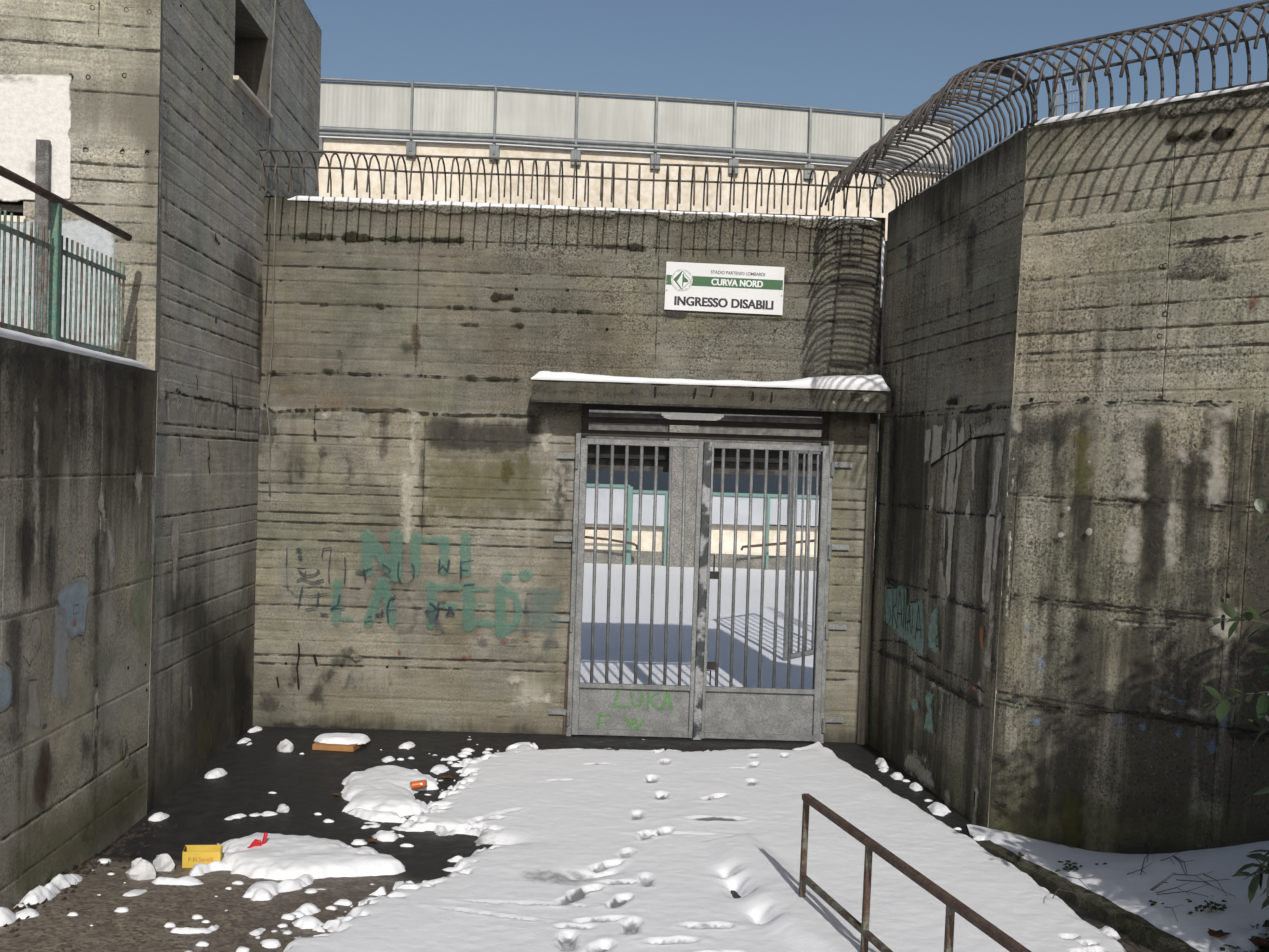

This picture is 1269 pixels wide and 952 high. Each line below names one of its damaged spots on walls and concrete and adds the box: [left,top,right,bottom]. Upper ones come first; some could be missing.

leakage [0,347,179,600]
leakage [94,492,115,684]
leakage [866,418,897,584]
leakage [924,416,1004,668]
leakage [1117,421,1244,579]
peeling [1210,405,1233,419]
leakage [9,617,22,726]